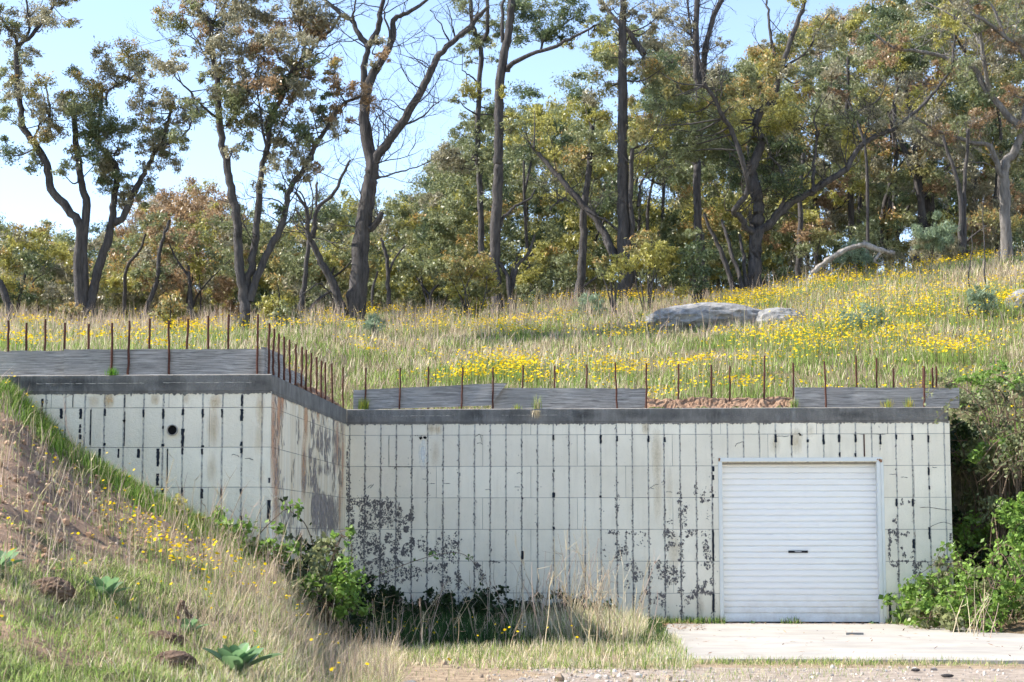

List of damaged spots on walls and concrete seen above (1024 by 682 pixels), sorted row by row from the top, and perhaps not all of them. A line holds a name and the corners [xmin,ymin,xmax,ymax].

corrosion [271,396,284,509]
peeling [267,397,539,602]
peeling [584,424,718,625]